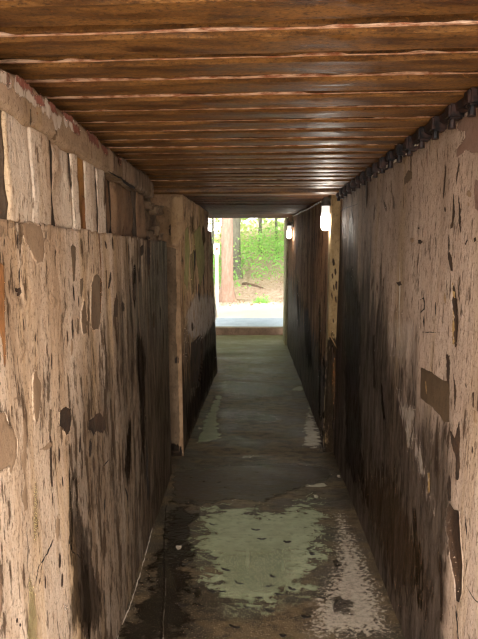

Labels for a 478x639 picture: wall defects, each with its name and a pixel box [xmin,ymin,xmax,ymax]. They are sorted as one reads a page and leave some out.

peeling [0,70,80,136]
peeling [67,233,113,356]
peeling [0,411,34,510]
peeling [31,370,72,505]
leakage [64,470,102,639]
leakage [124,422,132,486]
leakage [137,333,146,462]
leakage [117,463,332,639]
leakage [333,596,354,615]
leakage [344,269,433,616]
peeling [420,354,457,422]
spalling [445,422,464,604]